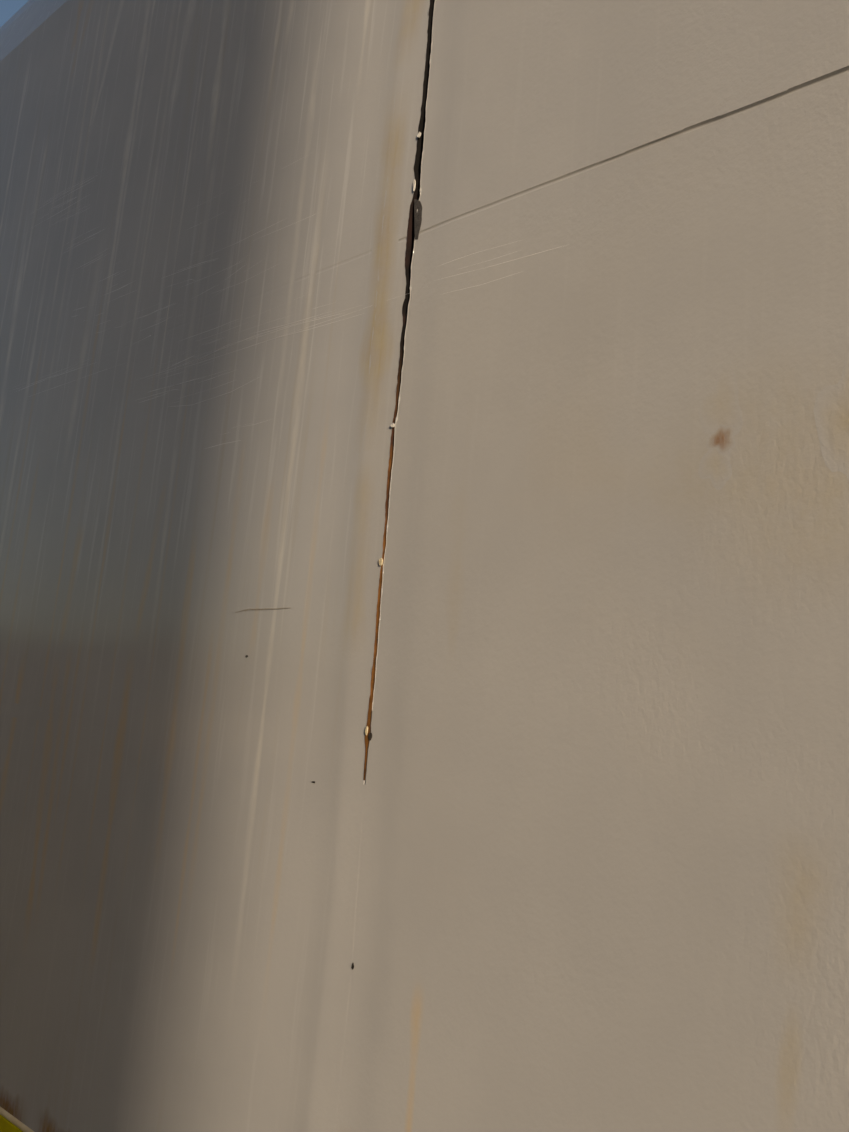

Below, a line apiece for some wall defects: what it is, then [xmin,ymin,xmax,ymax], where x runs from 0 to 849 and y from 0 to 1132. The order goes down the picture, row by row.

crack [364,0,435,780]